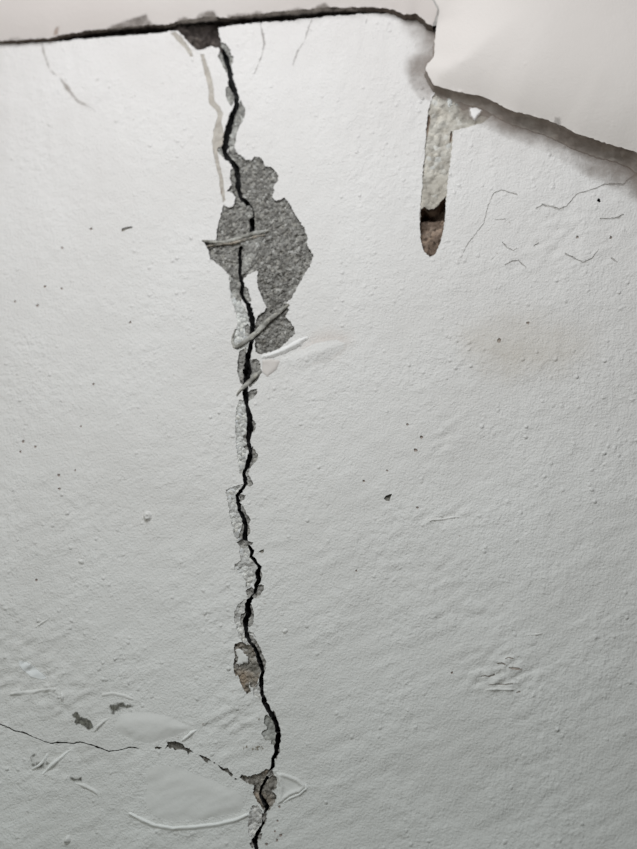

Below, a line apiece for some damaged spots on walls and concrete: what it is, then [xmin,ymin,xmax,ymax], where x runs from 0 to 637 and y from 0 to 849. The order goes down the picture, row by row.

peeling [469,108,481,121]
spalling [202,150,313,354]
spalling [420,196,446,257]
crack [0,11,370,849]
spalling [261,715,276,745]